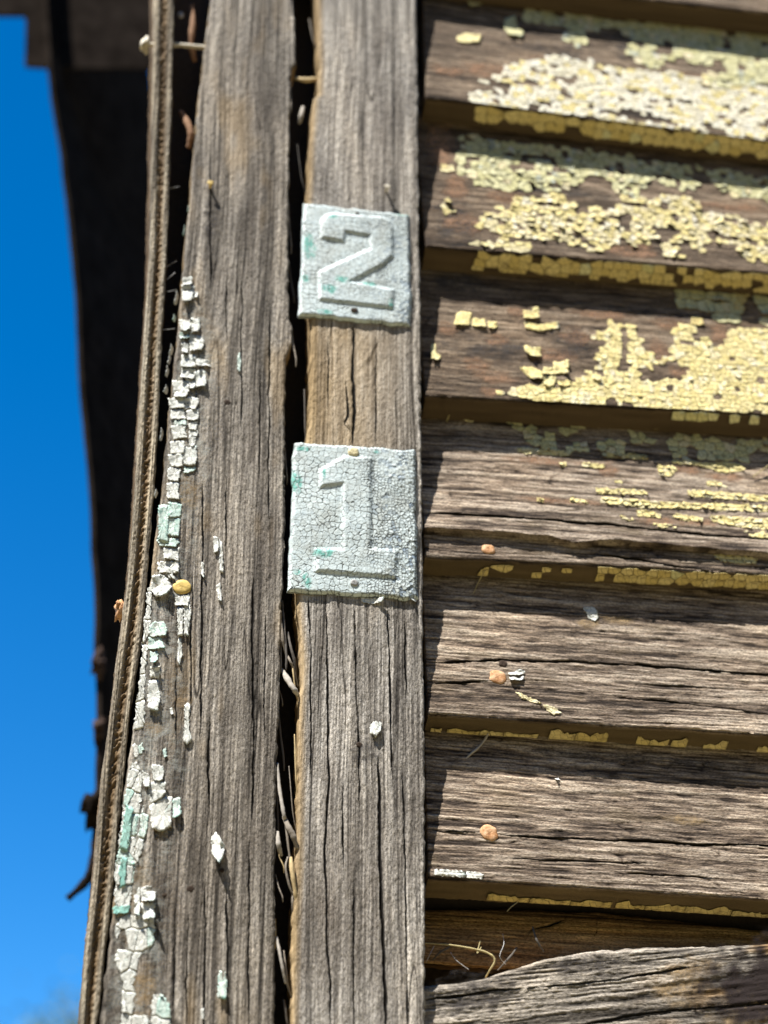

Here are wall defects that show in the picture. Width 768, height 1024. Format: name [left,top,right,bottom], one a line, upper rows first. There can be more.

peeling [440,9,768,538]
peeling [477,565,513,576]
peeling [531,567,572,578]
peeling [595,554,768,590]
peeling [112,276,211,1024]
peeling [430,728,609,742]
peeling [636,736,688,747]
peeling [702,740,729,750]
peeling [487,893,768,918]